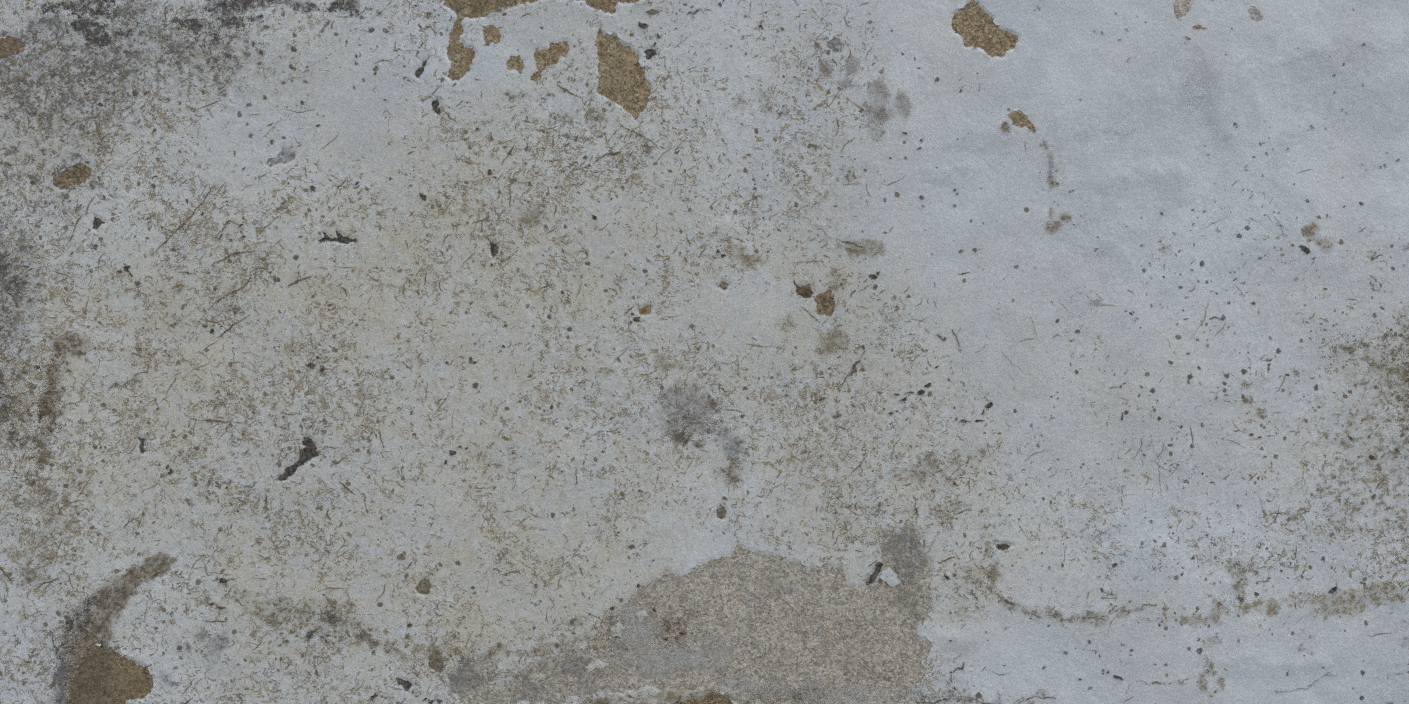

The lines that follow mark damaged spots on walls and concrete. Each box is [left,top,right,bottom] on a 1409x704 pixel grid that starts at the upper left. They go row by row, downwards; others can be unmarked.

peeling [425,0,570,80]
spalling [569,0,661,122]
spalling [951,0,1022,60]
spalling [1007,108,1036,134]
spalling [53,163,96,189]
spalling [416,578,432,594]
spalling [429,525,950,704]
spalling [69,643,157,704]
spalling [396,678,434,704]